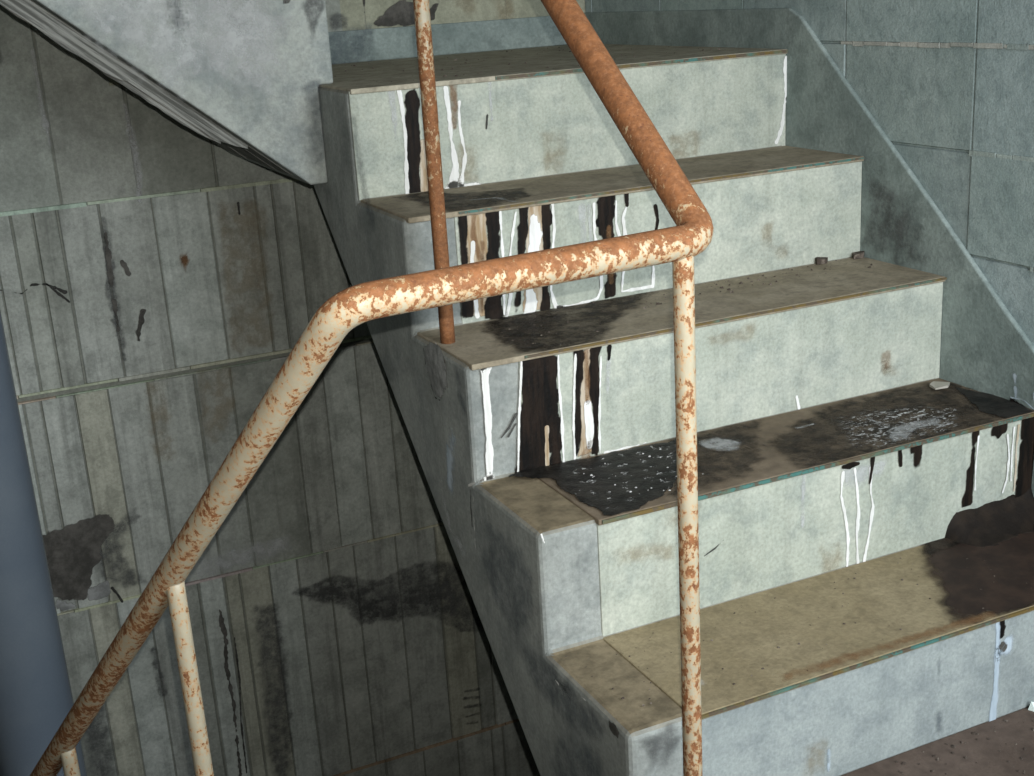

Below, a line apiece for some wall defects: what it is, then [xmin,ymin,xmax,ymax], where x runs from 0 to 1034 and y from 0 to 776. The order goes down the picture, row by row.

damp [443,85,556,264]
damp [579,193,629,241]
damp [461,266,677,516]
damp [697,422,760,483]
damp [770,374,1034,567]
damp [923,532,1034,722]